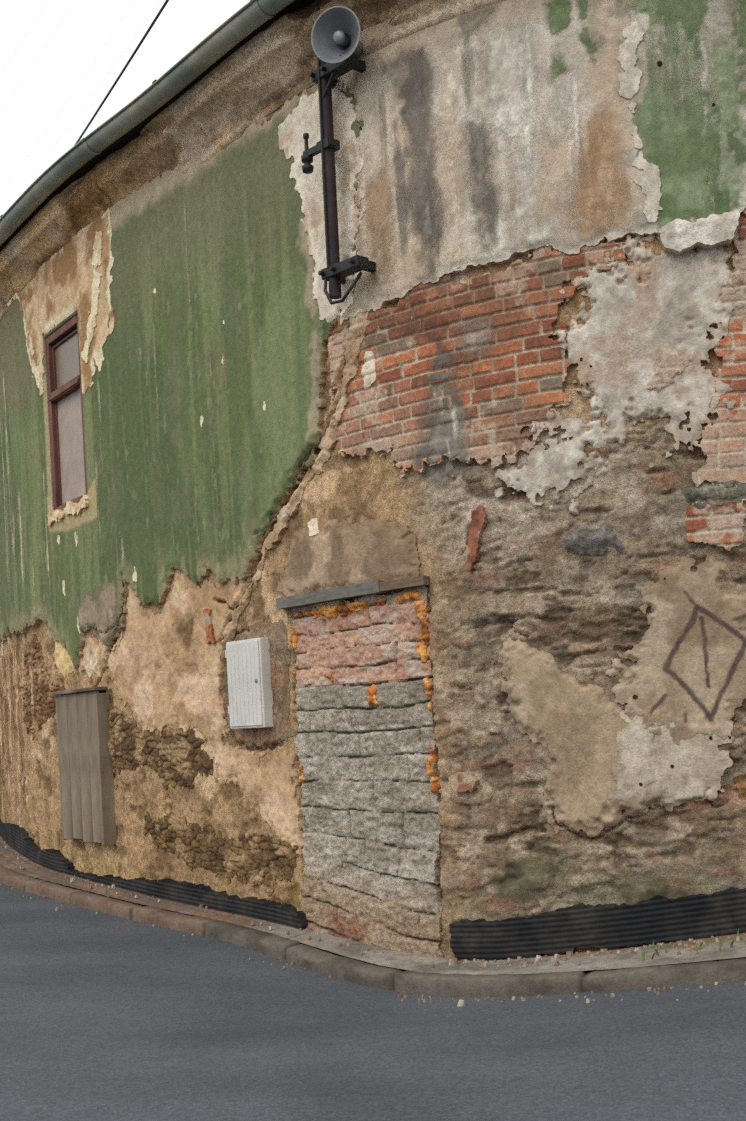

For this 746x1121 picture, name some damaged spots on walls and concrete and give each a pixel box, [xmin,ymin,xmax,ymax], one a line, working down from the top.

spalling [288,0,400,38]
peeling [545,0,596,59]
leakage [679,33,712,123]
leakage [379,8,579,283]
flaking render [0,181,115,396]
flaking render [264,51,627,478]
peeling [617,0,746,552]
flaking render [463,505,488,571]
flaking render [20,634,66,740]
flaking render [218,619,301,751]
flaking render [107,697,213,790]
flaking render [143,811,299,895]